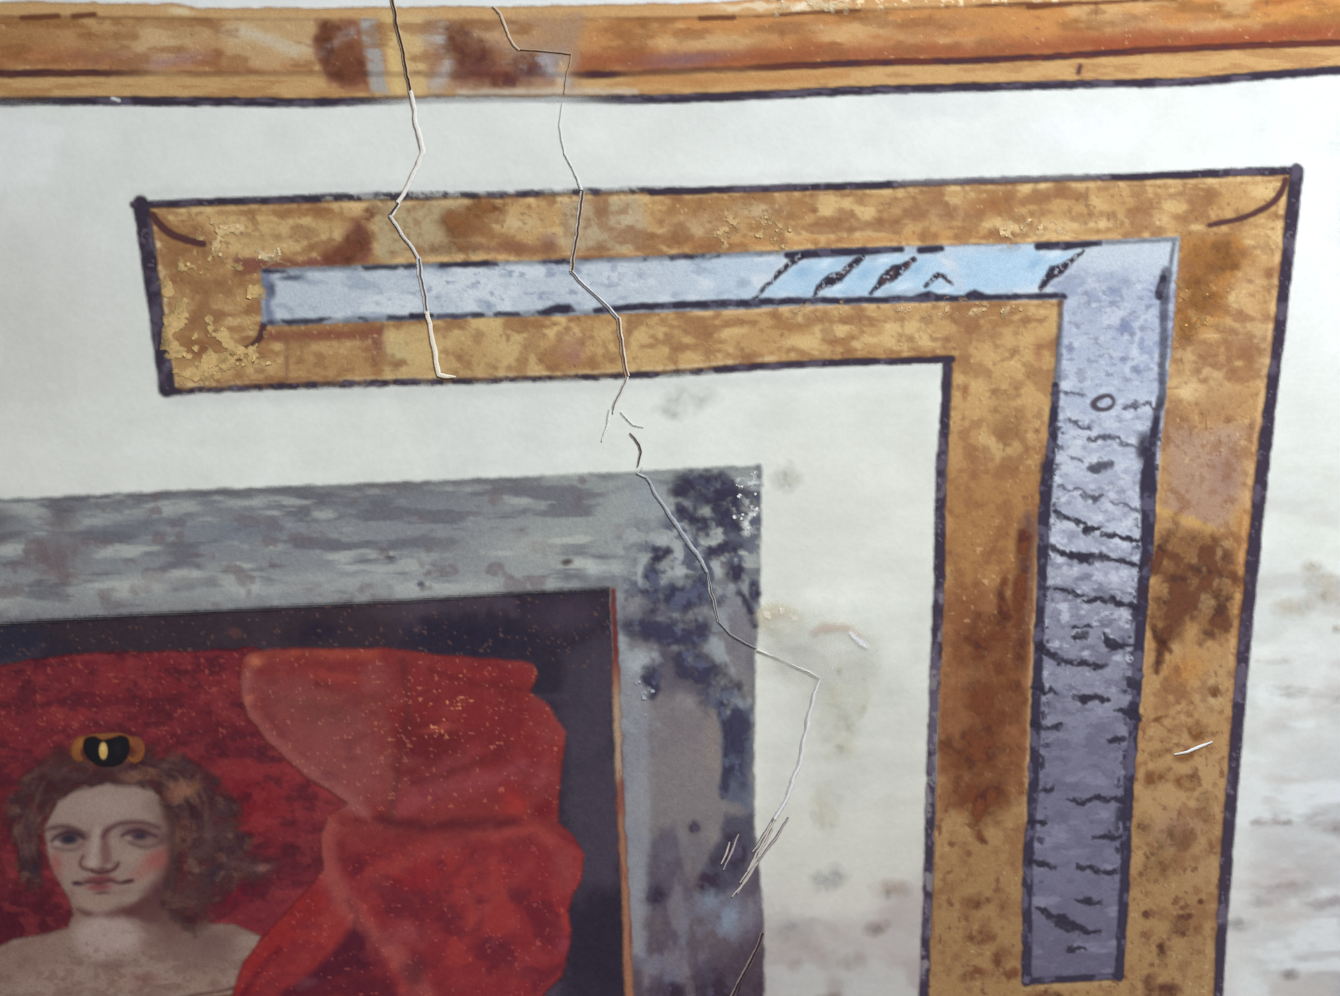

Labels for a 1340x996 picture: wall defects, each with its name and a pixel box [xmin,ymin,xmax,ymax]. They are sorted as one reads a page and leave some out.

peeling [161,219,281,384]
crack [388,0,456,379]
crack [492,6,822,872]
water stain [621,547,749,797]
water stain [671,473,760,627]
crack [730,932,764,996]